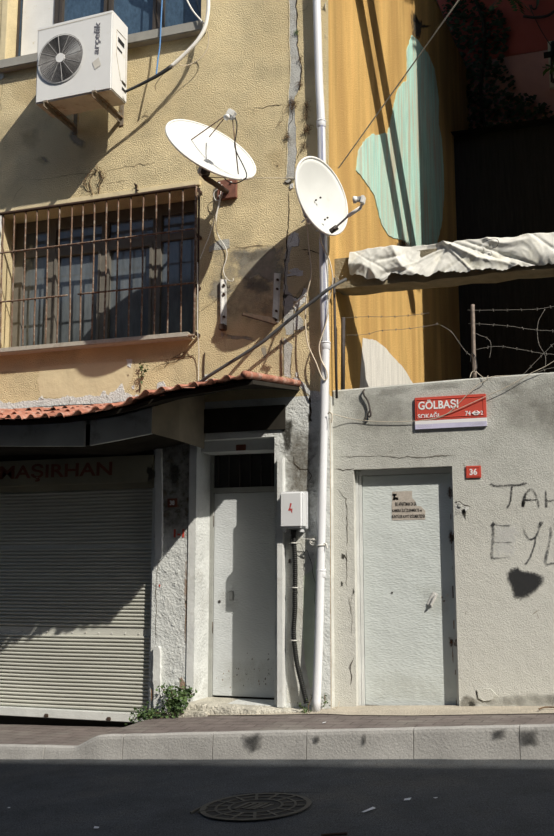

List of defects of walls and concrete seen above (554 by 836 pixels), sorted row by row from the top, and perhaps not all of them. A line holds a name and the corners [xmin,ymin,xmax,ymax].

crack [254,0,307,170]
crack [285,193,319,263]
damp [209,245,280,299]
flaking render [281,244,320,415]
peeling [0,382,140,409]